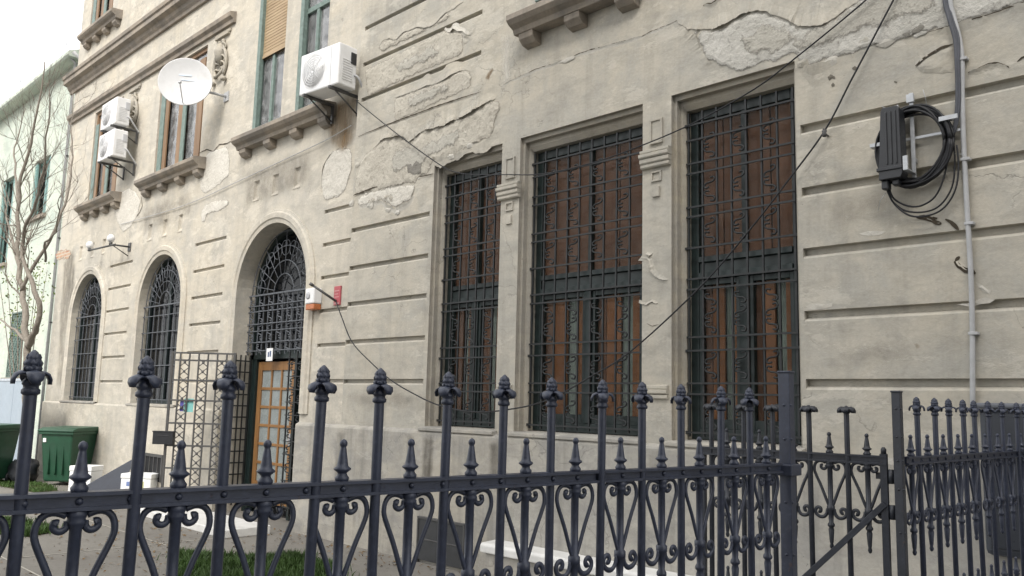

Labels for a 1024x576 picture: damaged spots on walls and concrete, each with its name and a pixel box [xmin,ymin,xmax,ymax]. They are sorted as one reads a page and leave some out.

spalling [365,0,476,120]
crack [503,20,677,86]
spalling [674,0,1024,87]
crack [968,56,1024,75]
spalling [115,188,140,232]
spalling [200,147,230,222]
spalling [319,144,415,215]